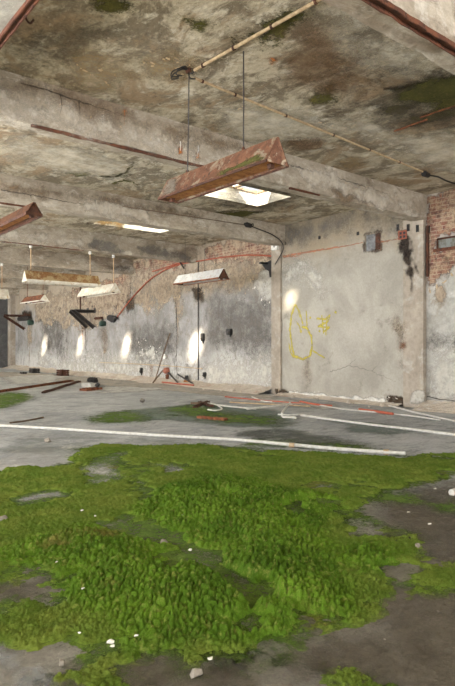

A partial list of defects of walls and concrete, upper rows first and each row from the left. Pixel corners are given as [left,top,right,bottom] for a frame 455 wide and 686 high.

damp [286,25,353,93]
peeling [22,239,271,331]
damp [399,246,418,289]
spalling [426,189,455,302]
damp [44,323,67,354]
damp [131,292,184,361]
damp [205,293,271,352]